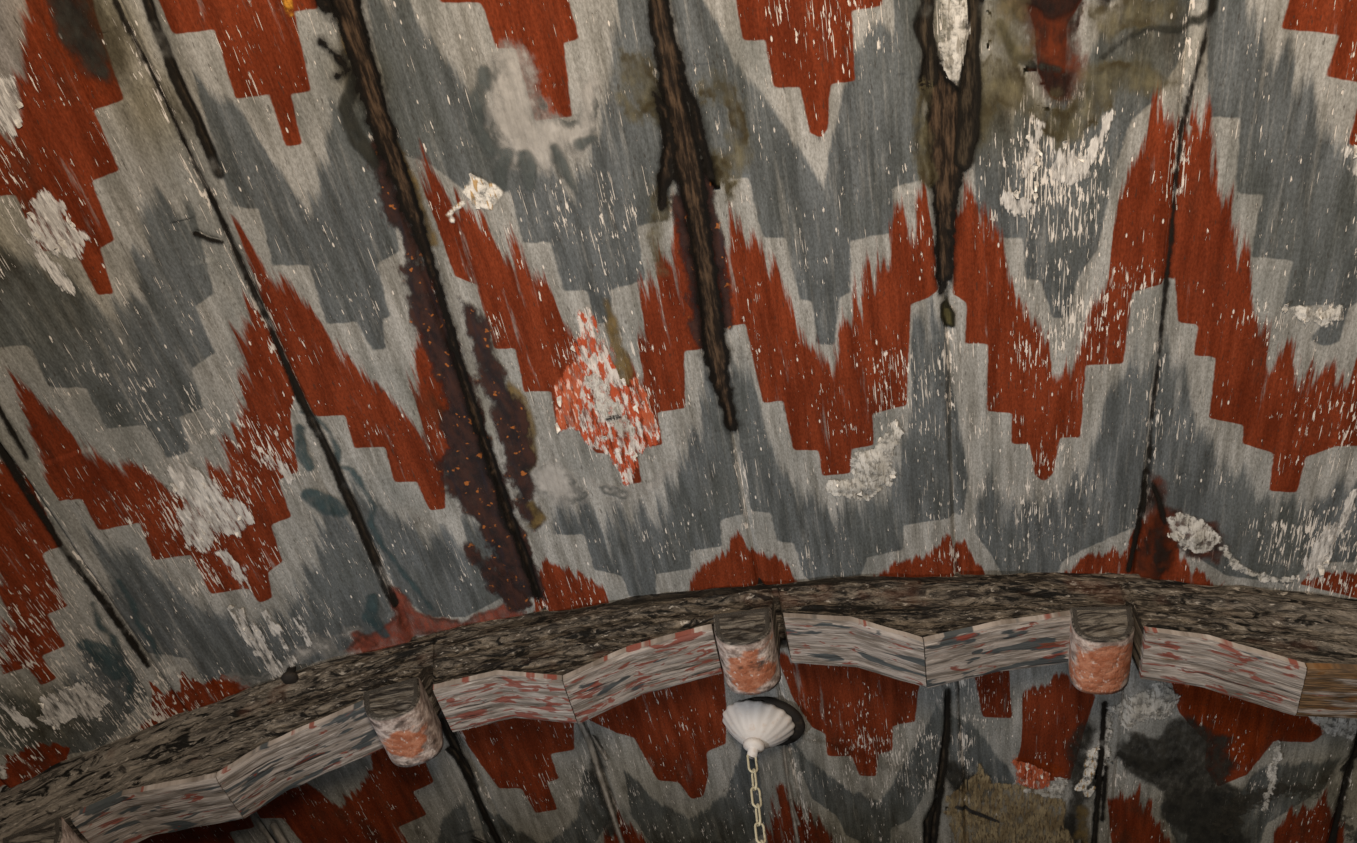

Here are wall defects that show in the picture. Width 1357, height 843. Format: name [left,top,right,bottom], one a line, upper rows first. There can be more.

leakage [981,0,1217,147]
peeling [19,187,90,296]
peeling [447,173,503,222]
peeling [1000,109,1114,217]
peeling [1341,145,1357,176]
peeling [554,307,660,486]
peeling [825,419,904,501]
peeling [1166,489,1357,583]